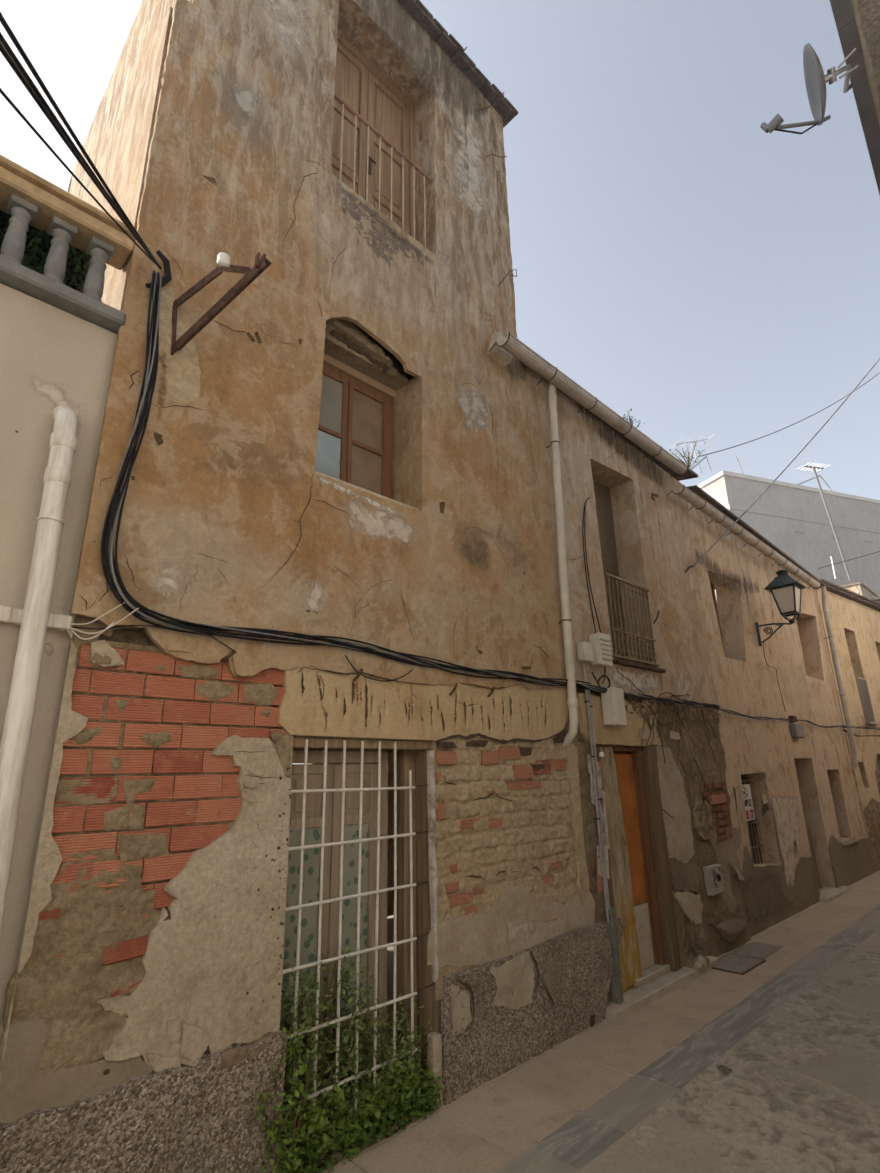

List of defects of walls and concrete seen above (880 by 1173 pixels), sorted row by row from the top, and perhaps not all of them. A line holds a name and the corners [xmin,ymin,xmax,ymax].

crack [263,474,379,589]
spalling [336,680,385,727]
spalling [2,628,293,1073]
peeling [399,693,610,924]
flaking render [672,891,704,925]
spalling [701,782,742,841]